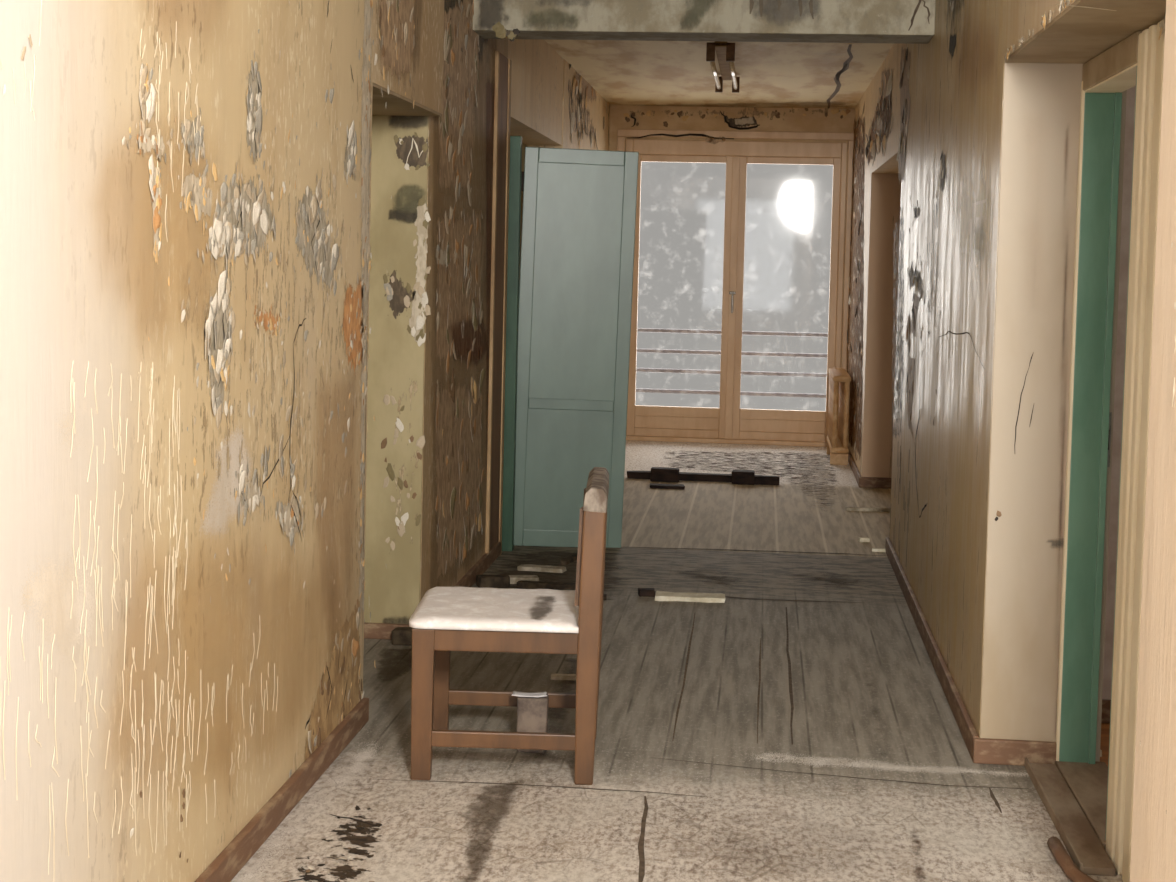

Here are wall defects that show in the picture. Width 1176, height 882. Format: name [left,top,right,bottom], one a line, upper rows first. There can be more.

leakage [444,0,508,59]
leakage [528,0,577,26]
leakage [682,0,714,27]
leakage [750,0,818,23]
crack [826,44,853,109]
peeling [623,47,911,460]
peeling [892,152,946,438]
leakage [0,361,278,875]